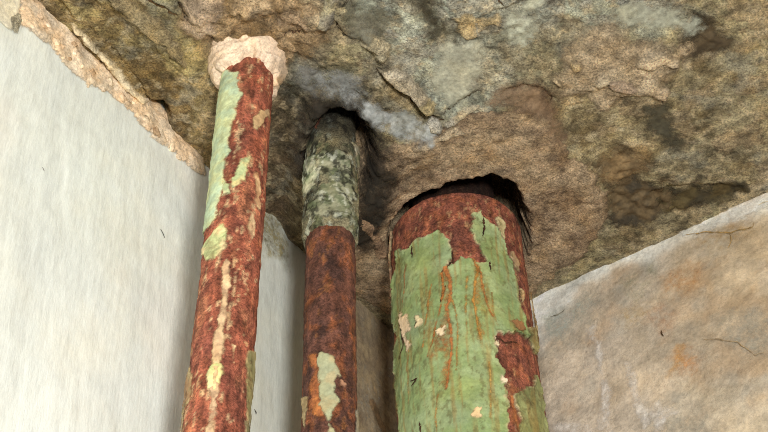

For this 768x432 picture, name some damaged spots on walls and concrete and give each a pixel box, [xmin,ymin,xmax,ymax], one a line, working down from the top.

spalling [0,0,206,175]
crack [148,0,188,22]
damp [290,66,436,250]
spalling [302,3,692,355]
damp [641,104,686,151]
crack [686,224,754,247]